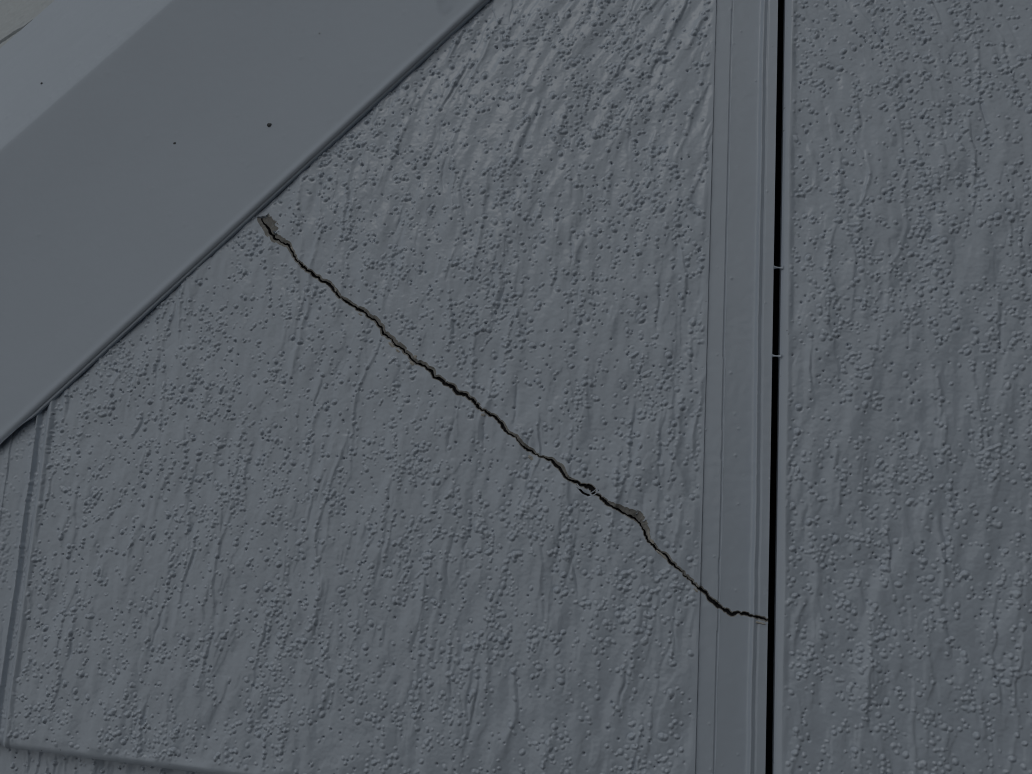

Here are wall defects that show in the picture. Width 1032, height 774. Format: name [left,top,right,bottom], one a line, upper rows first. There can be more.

crack [256,213,768,625]